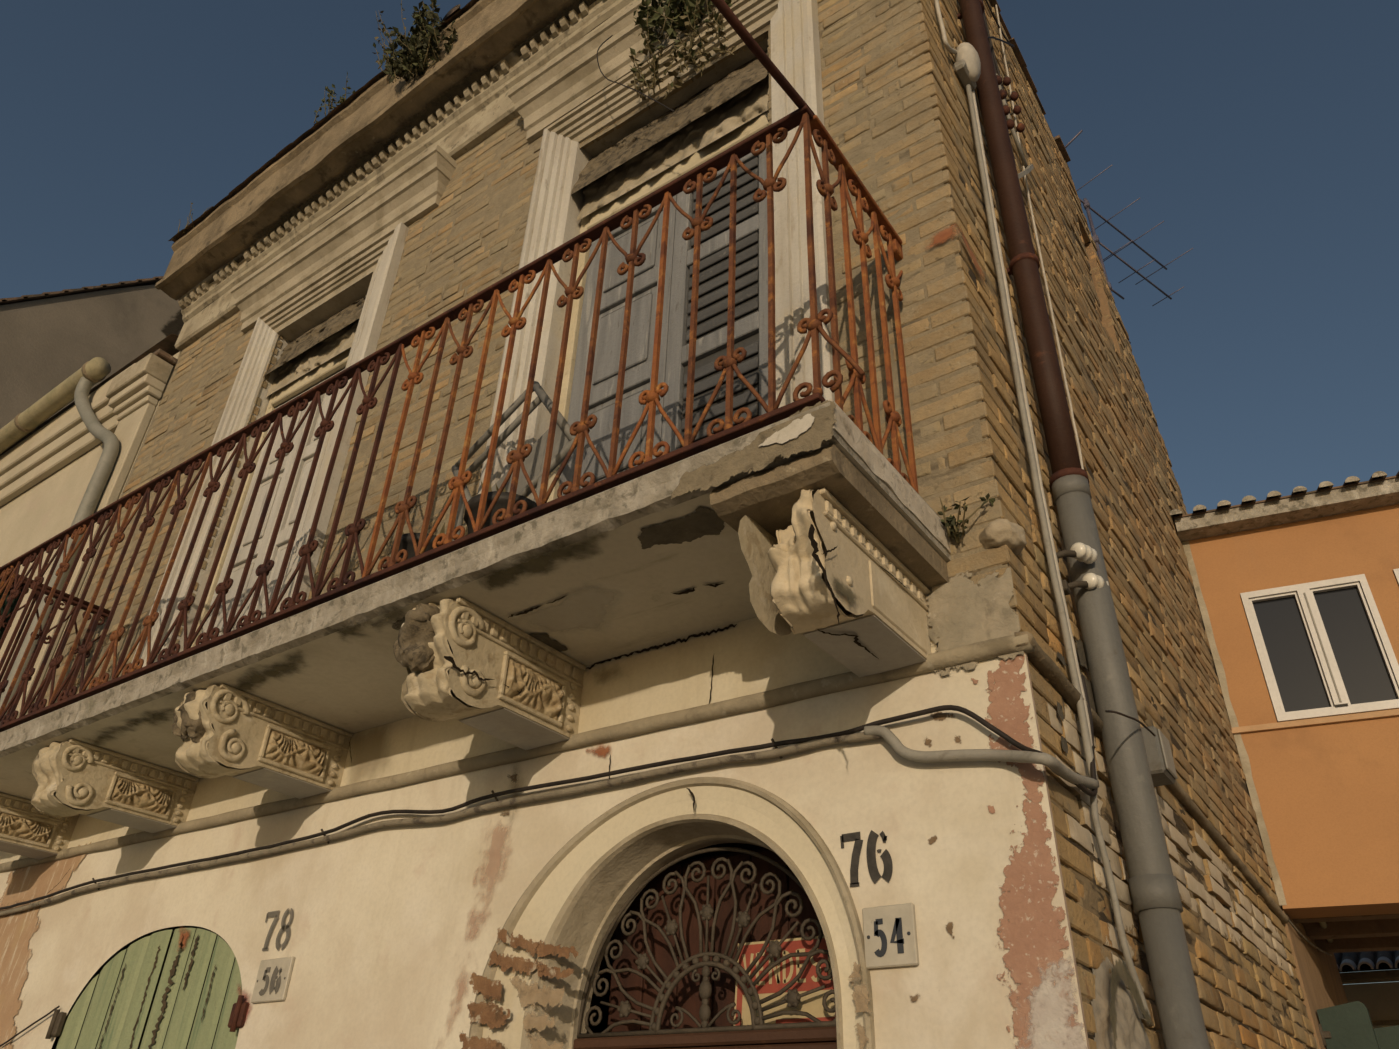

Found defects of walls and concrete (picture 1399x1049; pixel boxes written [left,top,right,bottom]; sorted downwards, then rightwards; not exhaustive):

spalling [638,400,837,549]
crack [808,524,877,658]
crack [444,656,524,694]
crack [586,624,737,704]
peeling [971,639,1153,1049]
peeling [0,842,91,1049]
spalling [459,928,581,1049]